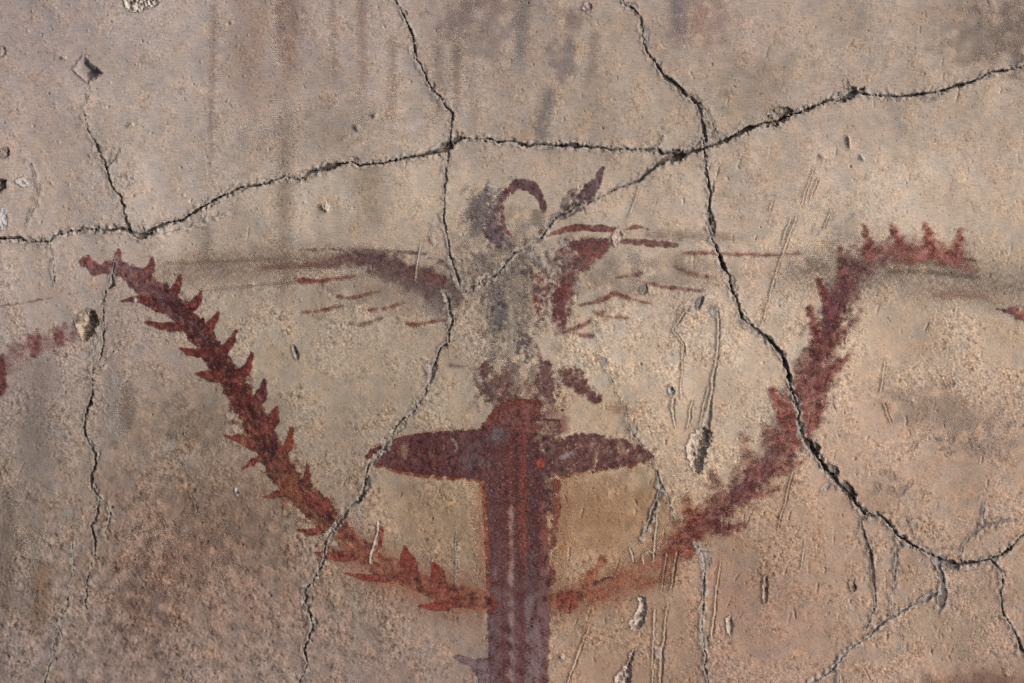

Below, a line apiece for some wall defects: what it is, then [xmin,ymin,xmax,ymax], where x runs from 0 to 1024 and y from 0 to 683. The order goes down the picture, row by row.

crack [43,256,123,683]
spalling [73,55,103,83]
crack [0,126,349,287]
crack [298,291,456,683]
crack [350,0,1024,683]
spalling [686,427,713,475]